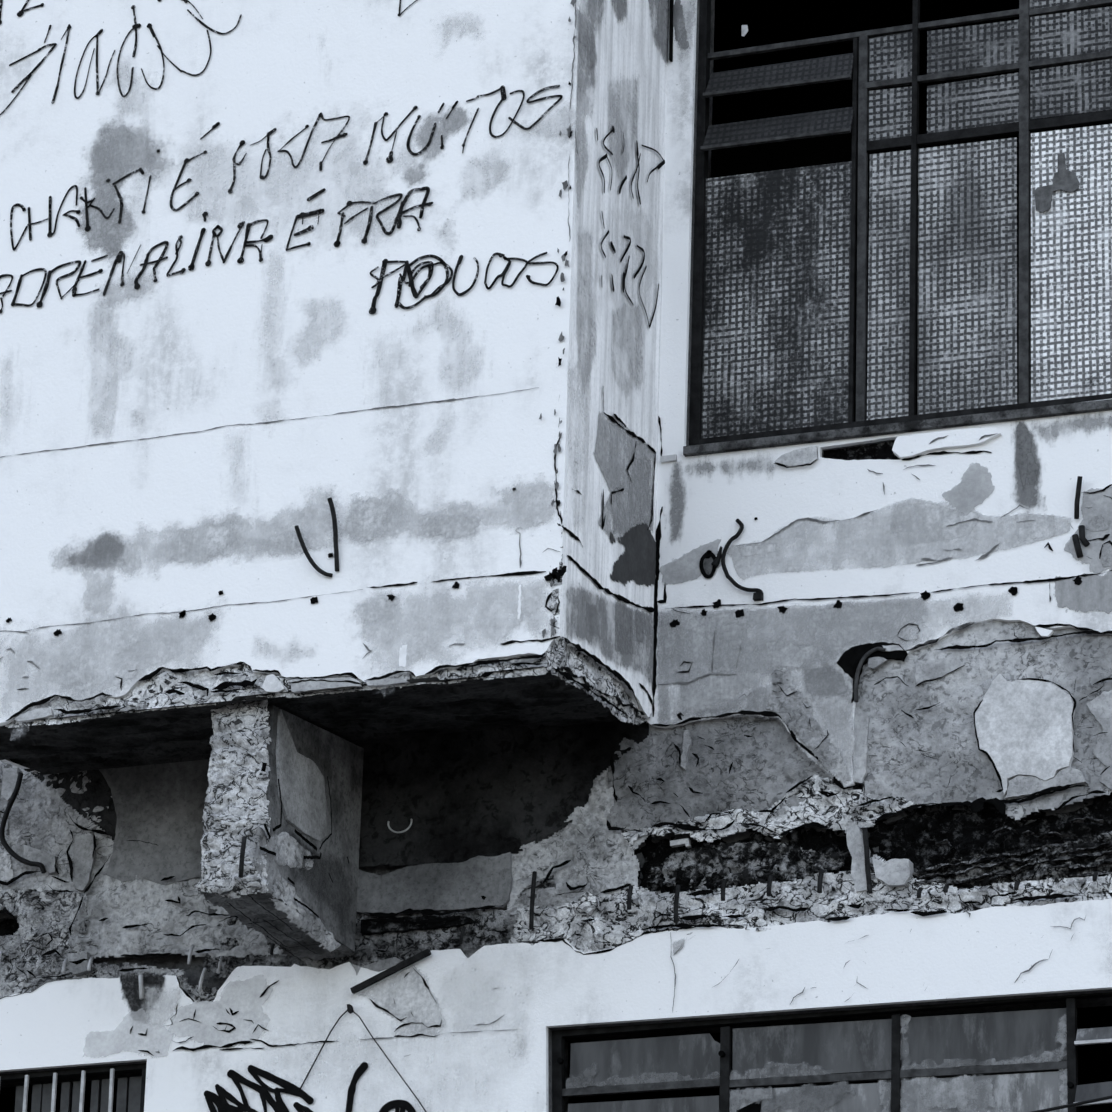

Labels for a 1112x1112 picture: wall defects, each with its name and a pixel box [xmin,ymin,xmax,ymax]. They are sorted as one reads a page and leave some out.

damp [78,125,165,256]
spalling [555,248,569,306]
damp [1014,414,1112,508]
damp [0,482,553,713]
spalling [0,409,1112,1048]